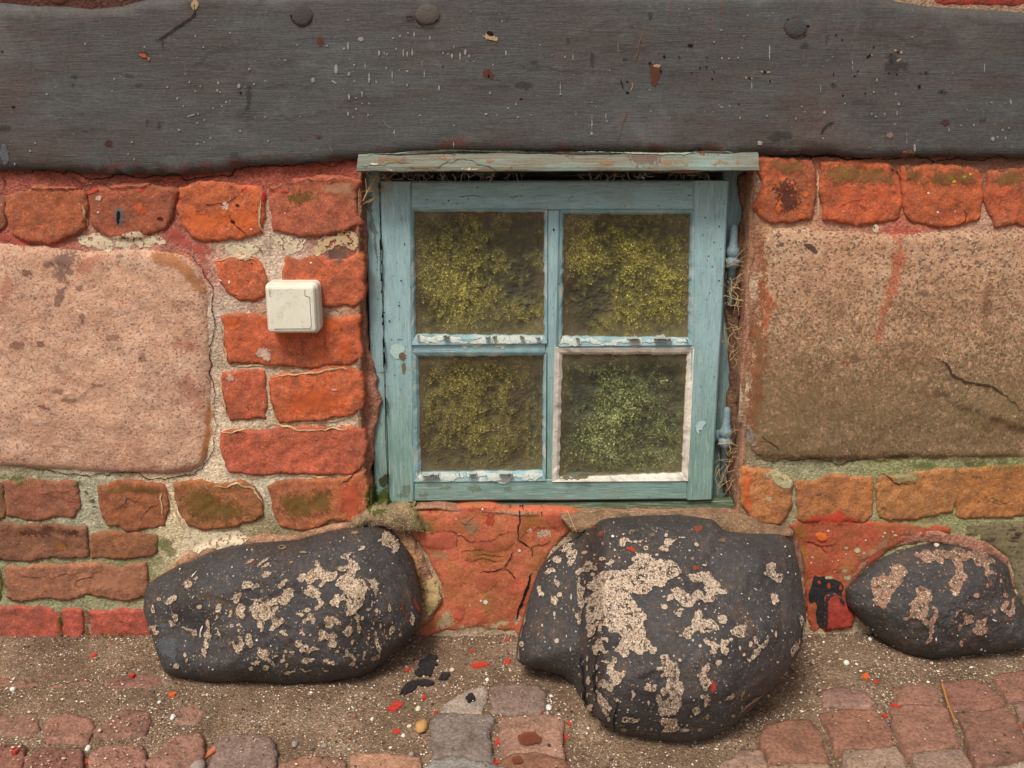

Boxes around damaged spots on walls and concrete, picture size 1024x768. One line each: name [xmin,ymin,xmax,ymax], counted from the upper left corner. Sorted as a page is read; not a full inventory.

peeling [78,211,166,254]
peeling [415,334,543,349]
peeling [559,334,687,348]
crack [933,357,1021,411]
peeling [415,470,542,484]
crack [439,504,550,619]